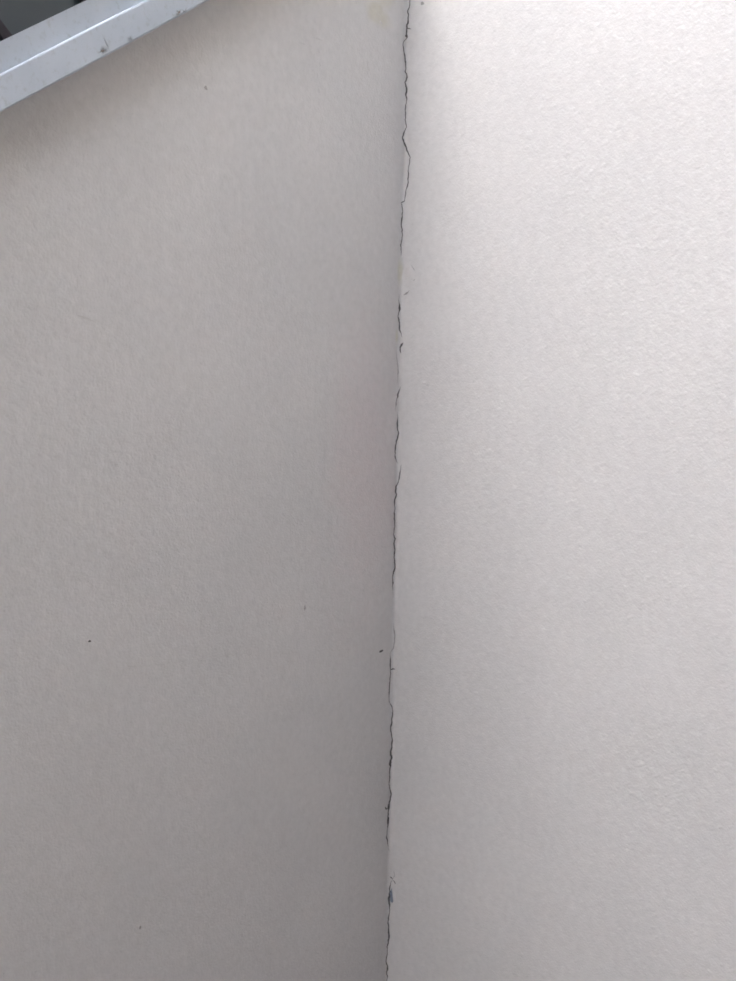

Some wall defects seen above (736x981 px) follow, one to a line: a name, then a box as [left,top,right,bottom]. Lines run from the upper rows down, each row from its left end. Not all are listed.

crack [400,1,411,253]
crack [392,303,402,597]
crack [385,626,396,850]
crack [386,874,395,981]